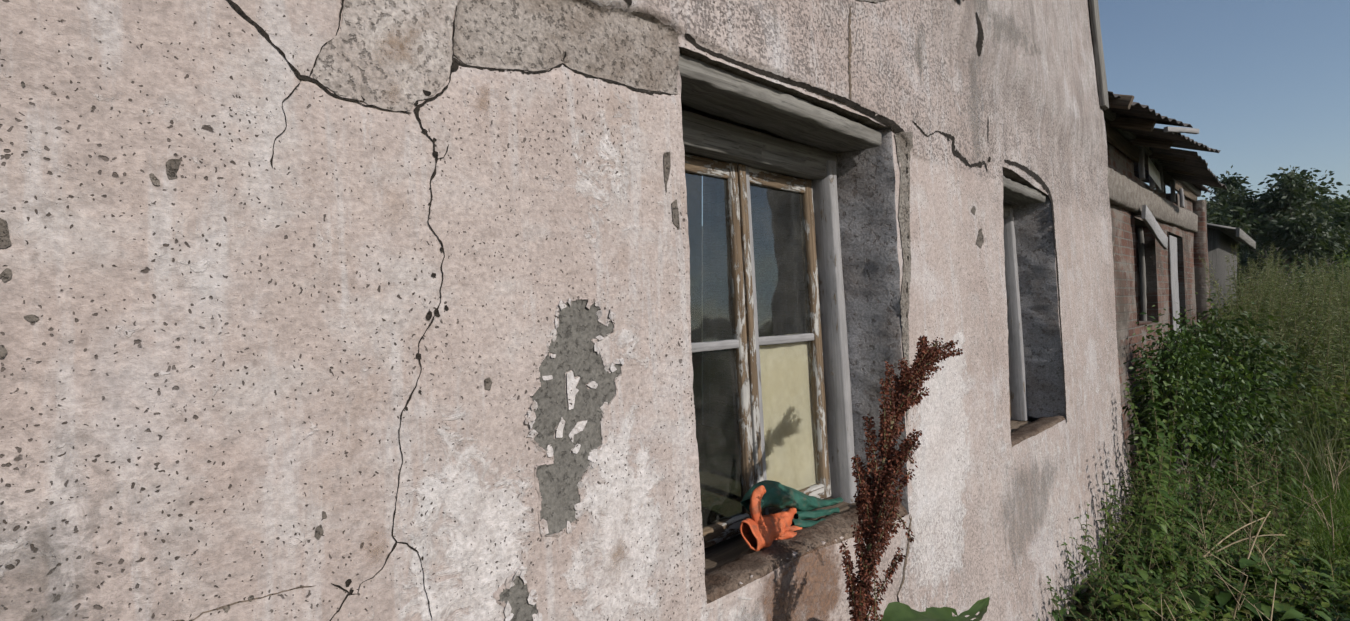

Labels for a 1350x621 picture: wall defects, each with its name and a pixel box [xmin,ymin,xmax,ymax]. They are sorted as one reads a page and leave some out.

flaking render [313,0,680,111]
crack [176,0,671,621]
peeling [523,297,624,538]
crack [685,0,1067,424]
peeling [493,565,542,621]